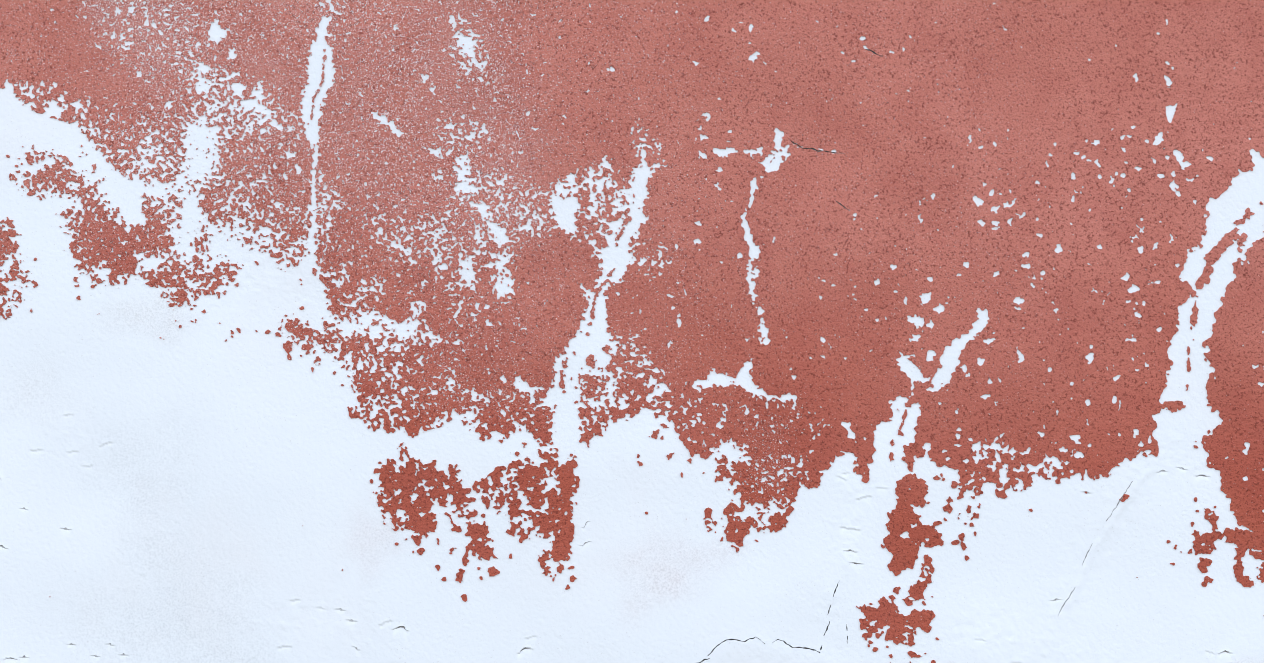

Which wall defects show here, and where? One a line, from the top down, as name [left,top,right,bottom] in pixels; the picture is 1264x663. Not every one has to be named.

peeling [1073,103,1199,209]
peeling [692,97,803,345]
peeling [973,168,1071,335]
peeling [1129,218,1177,254]
peeling [919,292,956,316]
peeling [1121,264,1161,321]
peeling [980,347,1025,415]
peeling [1077,342,1121,381]
peeling [841,422,866,443]
crack [699,469,864,663]